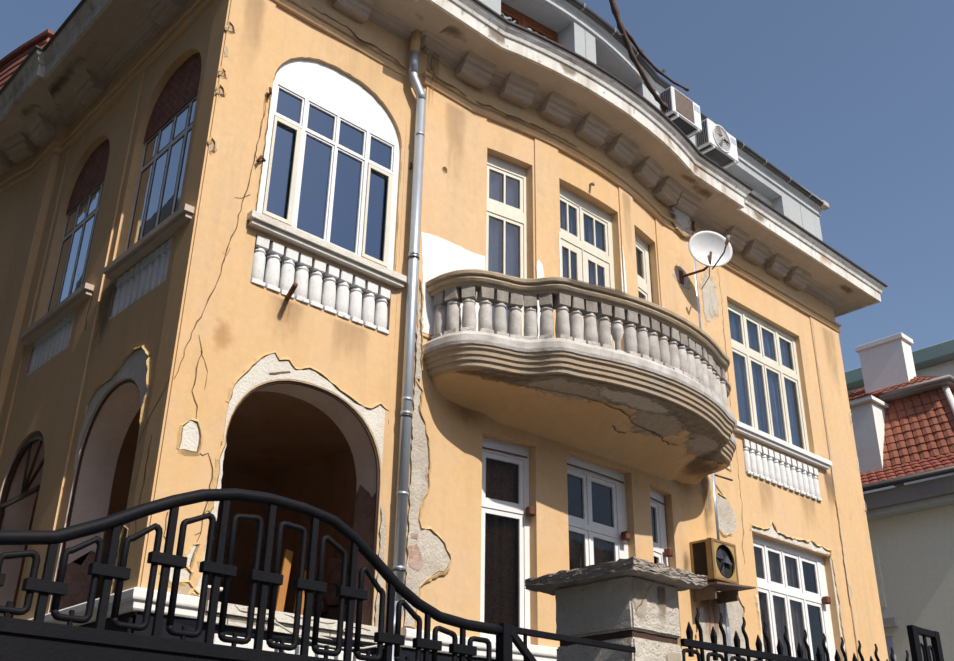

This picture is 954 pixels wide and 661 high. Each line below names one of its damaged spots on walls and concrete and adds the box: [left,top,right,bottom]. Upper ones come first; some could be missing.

crack [312,7,405,68]
crack [432,67,576,147]
crack [130,57,402,541]
spalling [176,417,204,456]
spalling [211,350,389,489]
spalling [404,279,452,629]
spalling [526,378,721,458]
spalling [207,501,219,520]
spalling [158,542,207,597]
flaking render [354,485,386,627]
spalling [696,595,765,661]
spalling [749,520,848,660]